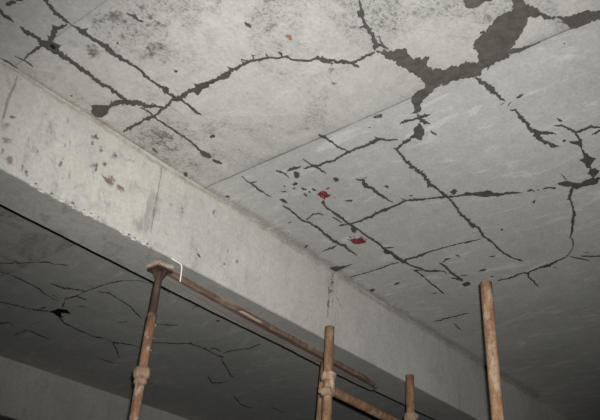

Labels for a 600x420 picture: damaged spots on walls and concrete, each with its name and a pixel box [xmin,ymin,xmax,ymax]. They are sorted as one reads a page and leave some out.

crack [0,0,389,164]
crack [242,77,600,294]
crack [0,261,169,364]
crack [153,342,260,384]